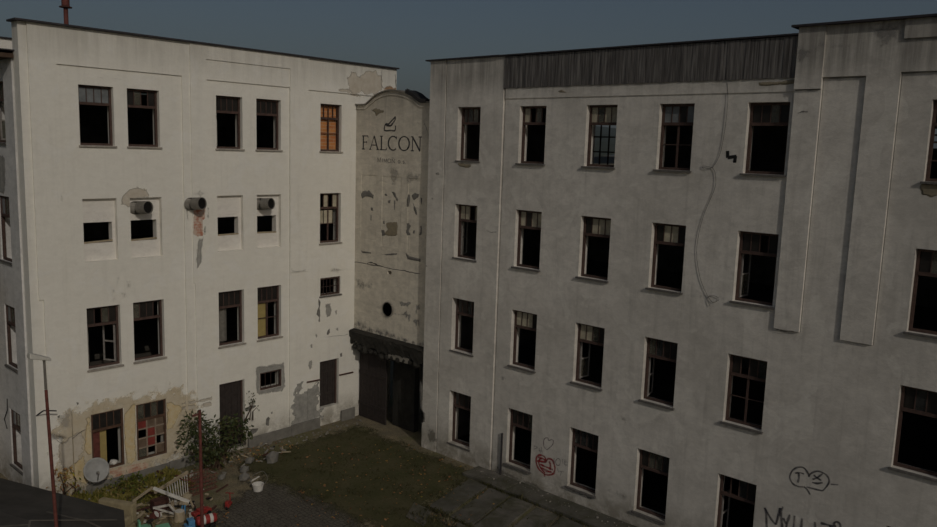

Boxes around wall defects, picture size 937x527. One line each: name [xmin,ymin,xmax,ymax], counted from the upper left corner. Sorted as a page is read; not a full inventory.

flaking render [385,192,422,215]
flaking render [920,184,937,197]
flaking render [193,209,205,236]
flaking render [381,221,422,236]
flaking render [166,397,212,430]
flaking render [291,381,324,425]
flaking render [59,417,92,484]
flaking render [110,404,148,478]